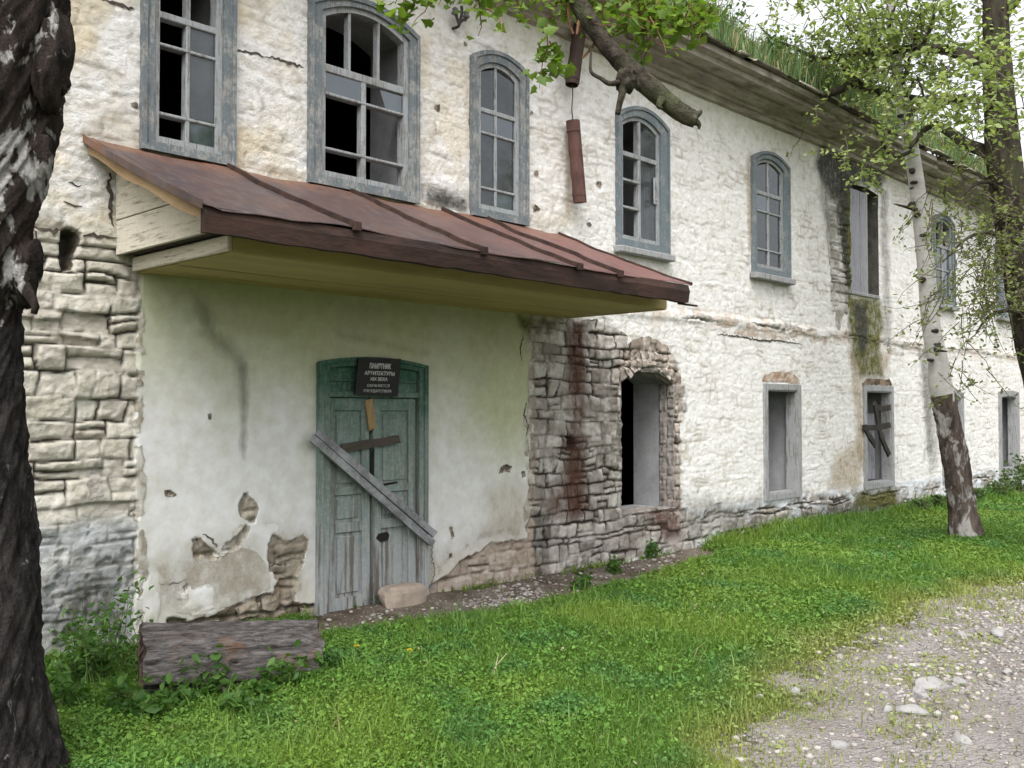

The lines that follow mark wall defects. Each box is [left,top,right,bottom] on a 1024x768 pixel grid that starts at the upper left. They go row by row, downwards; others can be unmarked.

crack [237,49,304,68]
crack [34,172,117,240]
leakage [818,149,886,288]
crack [717,334,802,345]
leakage [852,304,868,375]
flaking render [428,324,550,594]
rust [554,324,593,513]
flaking render [166,494,315,623]